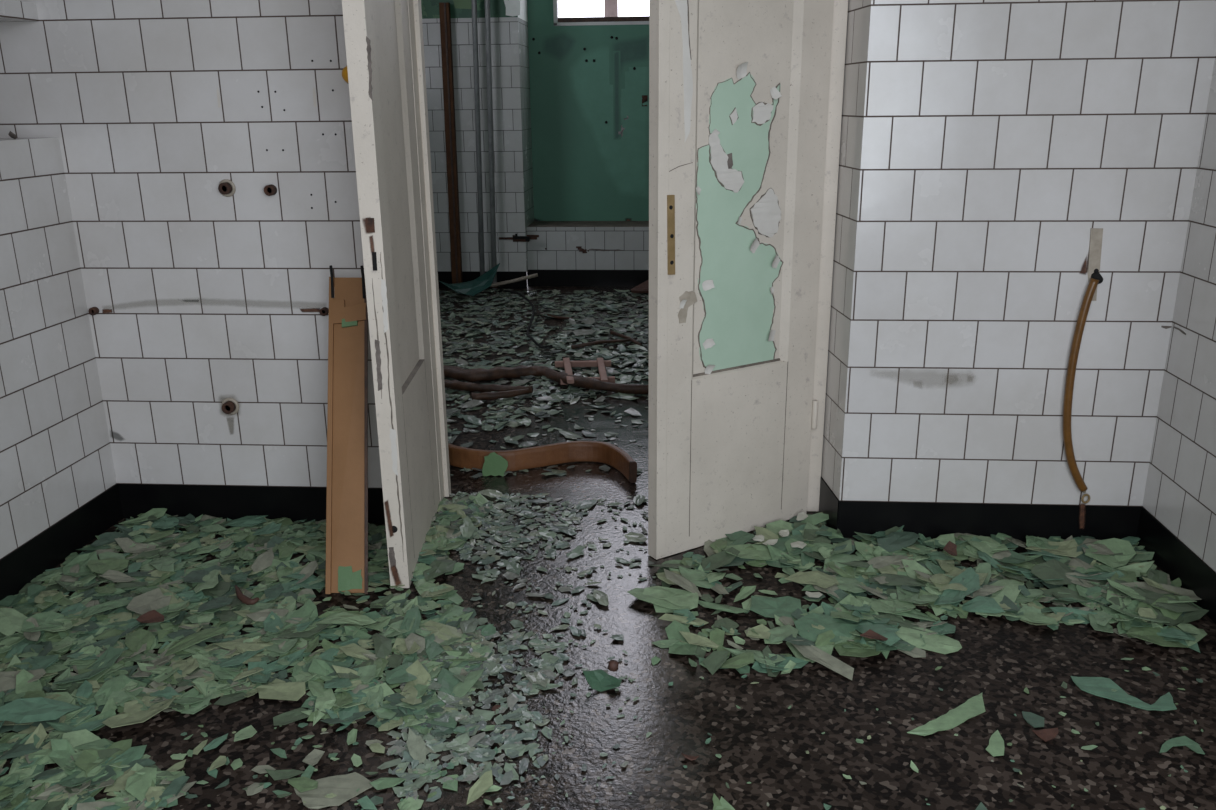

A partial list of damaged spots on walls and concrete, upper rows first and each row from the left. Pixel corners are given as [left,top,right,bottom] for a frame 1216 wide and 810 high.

peeling [675,0,784,374]